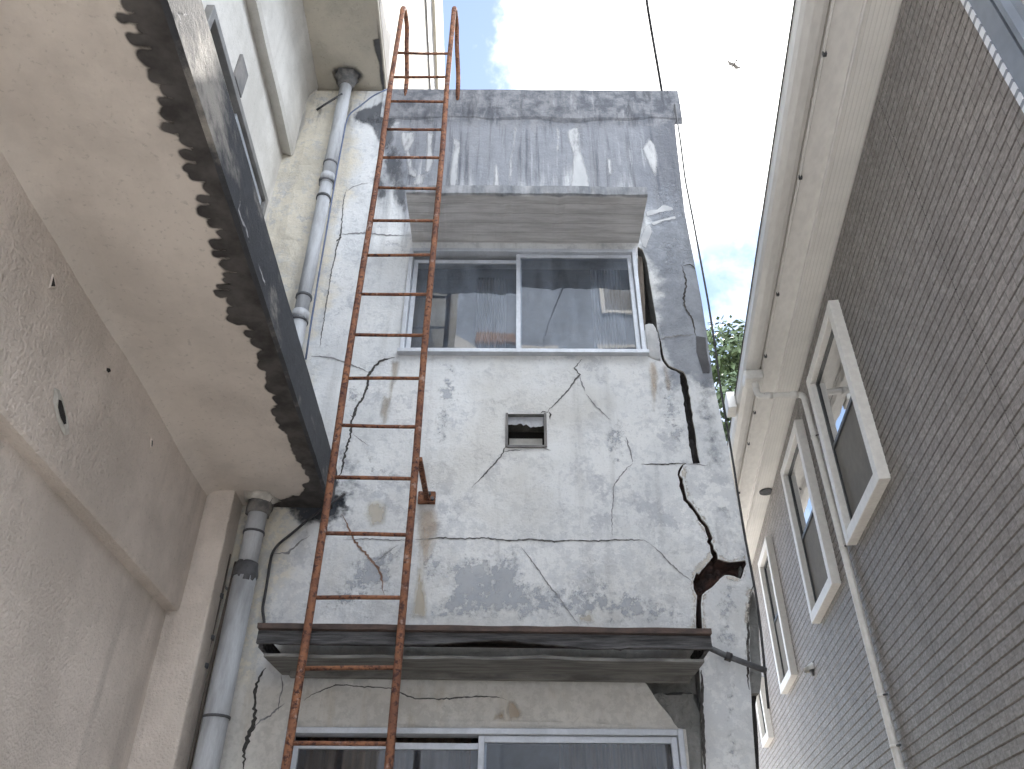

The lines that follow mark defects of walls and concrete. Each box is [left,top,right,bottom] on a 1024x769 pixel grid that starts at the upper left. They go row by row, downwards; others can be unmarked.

leakage [355,0,433,209]
leakage [450,140,459,185]
leakage [569,128,589,186]
leakage [643,140,657,172]
leakage [116,0,348,523]
crack [312,183,404,482]
crack [341,264,708,626]
peeling [440,559,672,619]
crack [242,668,506,769]